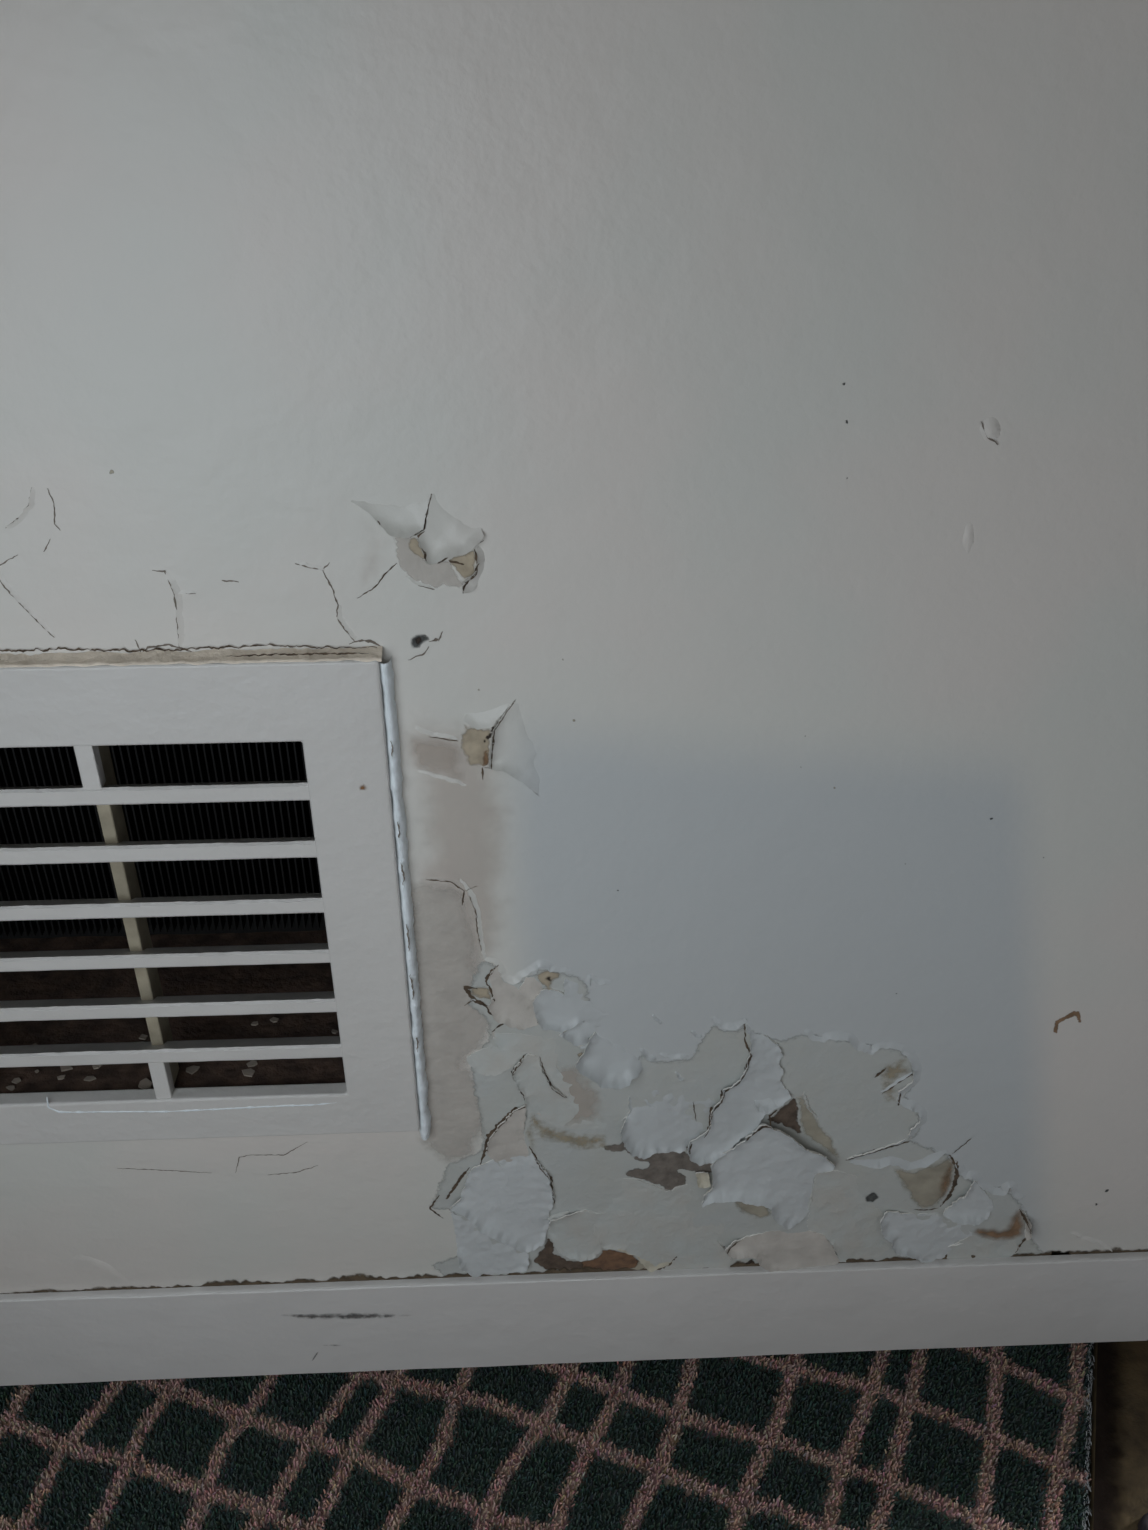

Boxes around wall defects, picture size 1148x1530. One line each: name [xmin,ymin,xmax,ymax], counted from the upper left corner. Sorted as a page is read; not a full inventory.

crack [0,487,60,638]
crack [135,570,238,652]
crack [295,561,443,660]
peeling [351,493,485,598]
peeling [415,701,540,796]
peeling [412,878,1042,1277]